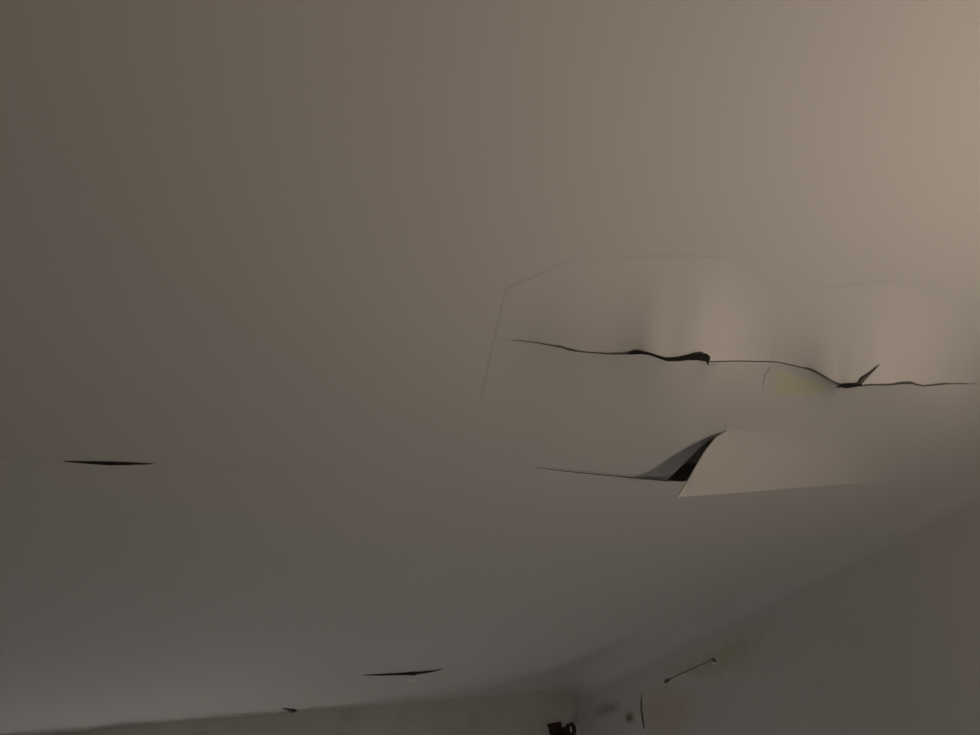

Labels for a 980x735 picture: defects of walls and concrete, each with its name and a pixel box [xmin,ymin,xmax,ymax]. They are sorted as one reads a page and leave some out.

crack [534,342,710,365]
crack [806,366,955,388]
flaking render [468,338,980,497]
crack [0,457,314,467]
crack [535,467,669,482]
crack [366,669,441,682]
crack [663,658,716,683]
crack [638,694,646,730]